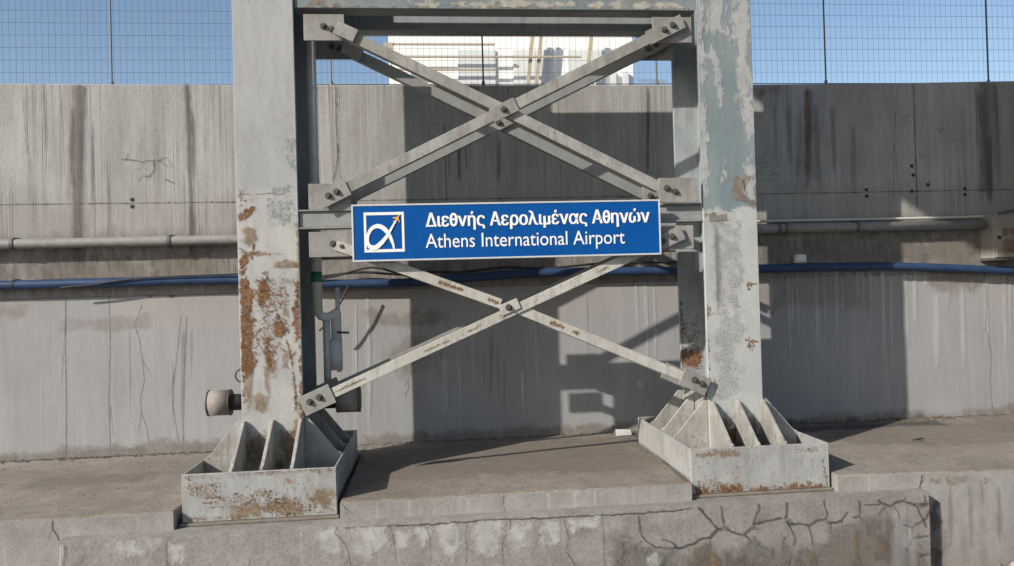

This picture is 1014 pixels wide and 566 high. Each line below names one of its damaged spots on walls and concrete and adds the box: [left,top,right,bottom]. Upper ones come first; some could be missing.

peeling [304,0,379,8]
damp [31,85,214,279]
crack [122,154,174,183]
peeling [391,0,756,222]
damp [979,82,1000,198]
rust [236,191,335,476]
rust [680,302,716,399]
damp [758,231,976,363]
rust [185,474,335,521]
crack [343,475,930,565]
rust [695,447,828,494]
damp [930,501,940,531]